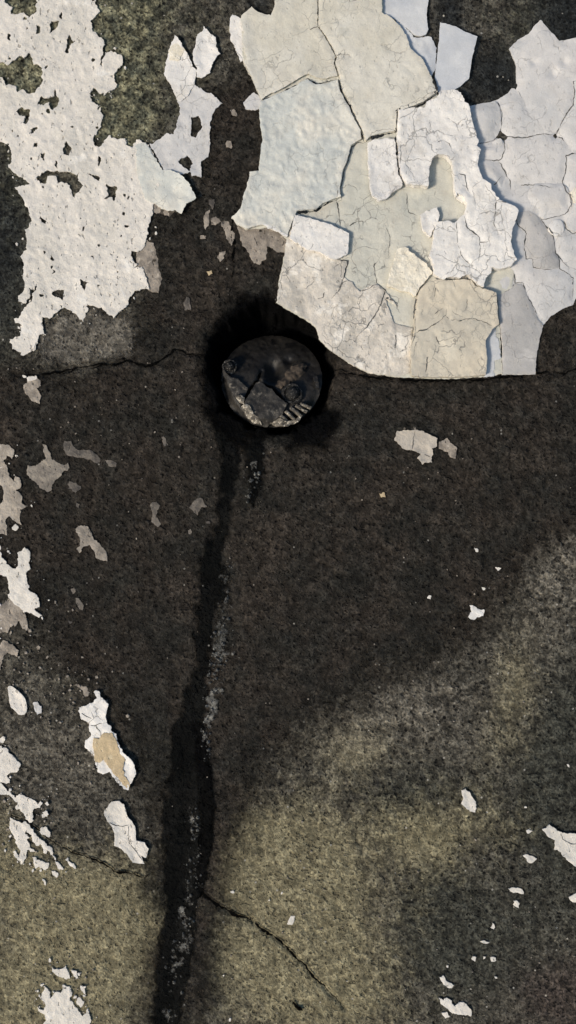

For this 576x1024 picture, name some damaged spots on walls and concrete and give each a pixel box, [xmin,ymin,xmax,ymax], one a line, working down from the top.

peeling [0,0,576,379]
crack [21,348,215,376]
damp [0,72,339,814]
peeling [394,428,457,464]
peeling [0,441,117,670]
damp [142,307,576,1024]
peeling [0,736,76,885]
peeling [37,958,92,1024]
peeling [75,684,149,864]
crack [194,887,342,1006]
peeling [508,887,524,908]
peeling [526,824,576,867]